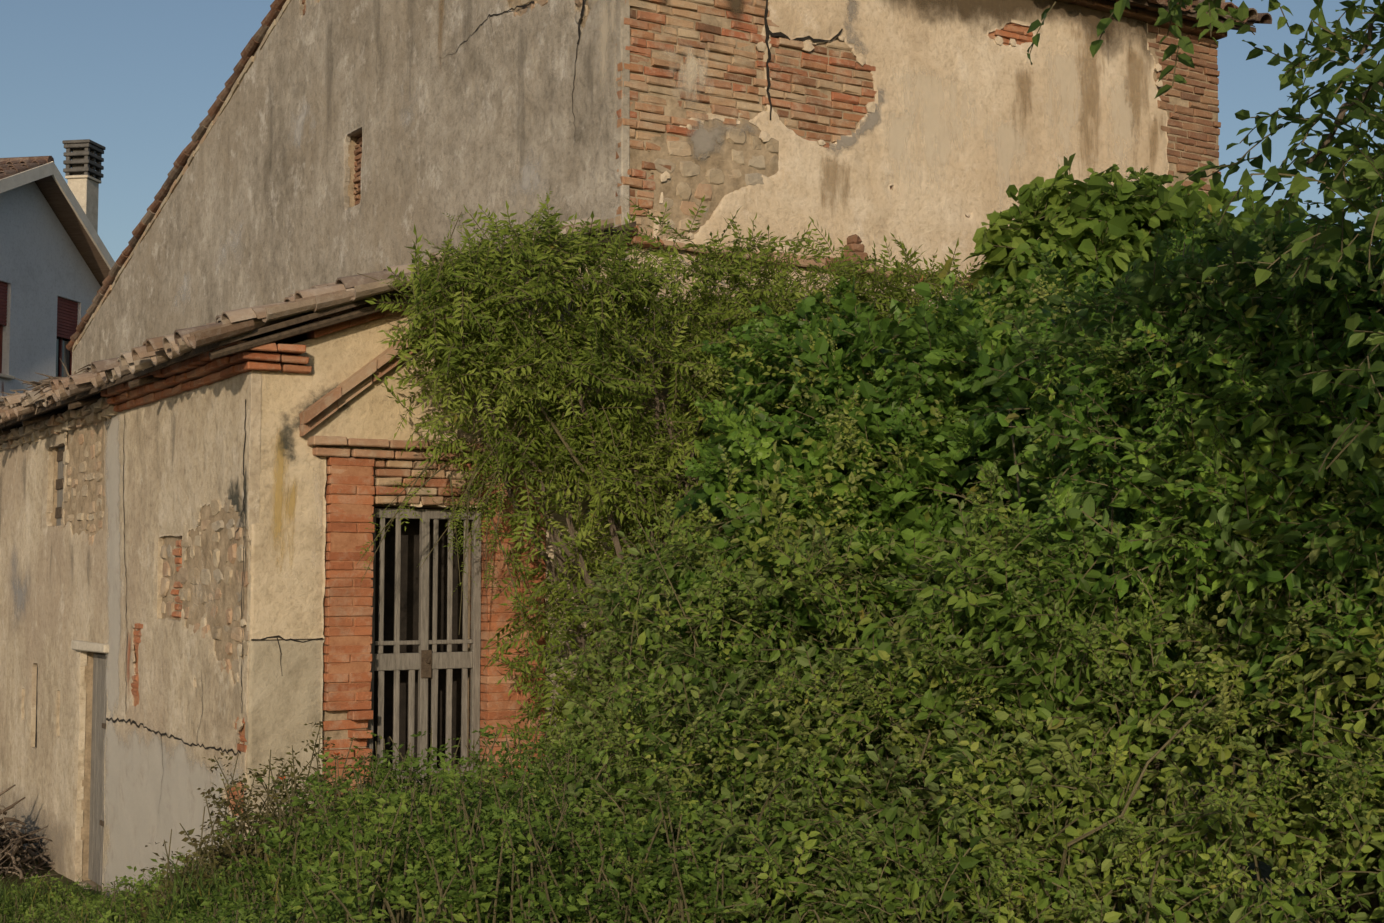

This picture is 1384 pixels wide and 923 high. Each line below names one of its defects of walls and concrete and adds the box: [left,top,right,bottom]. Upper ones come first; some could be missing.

flaking render [507,0,548,17]
crack [572,0,584,128]
flaking render [574,0,598,28]
flaking render [615,0,877,252]
crack [764,0,843,120]
flaking render [988,23,1033,46]
damp [901,0,1150,155]
flaking render [61,420,105,546]
crack [106,415,241,814]
flaking render [170,497,251,684]
crack [234,399,323,713]